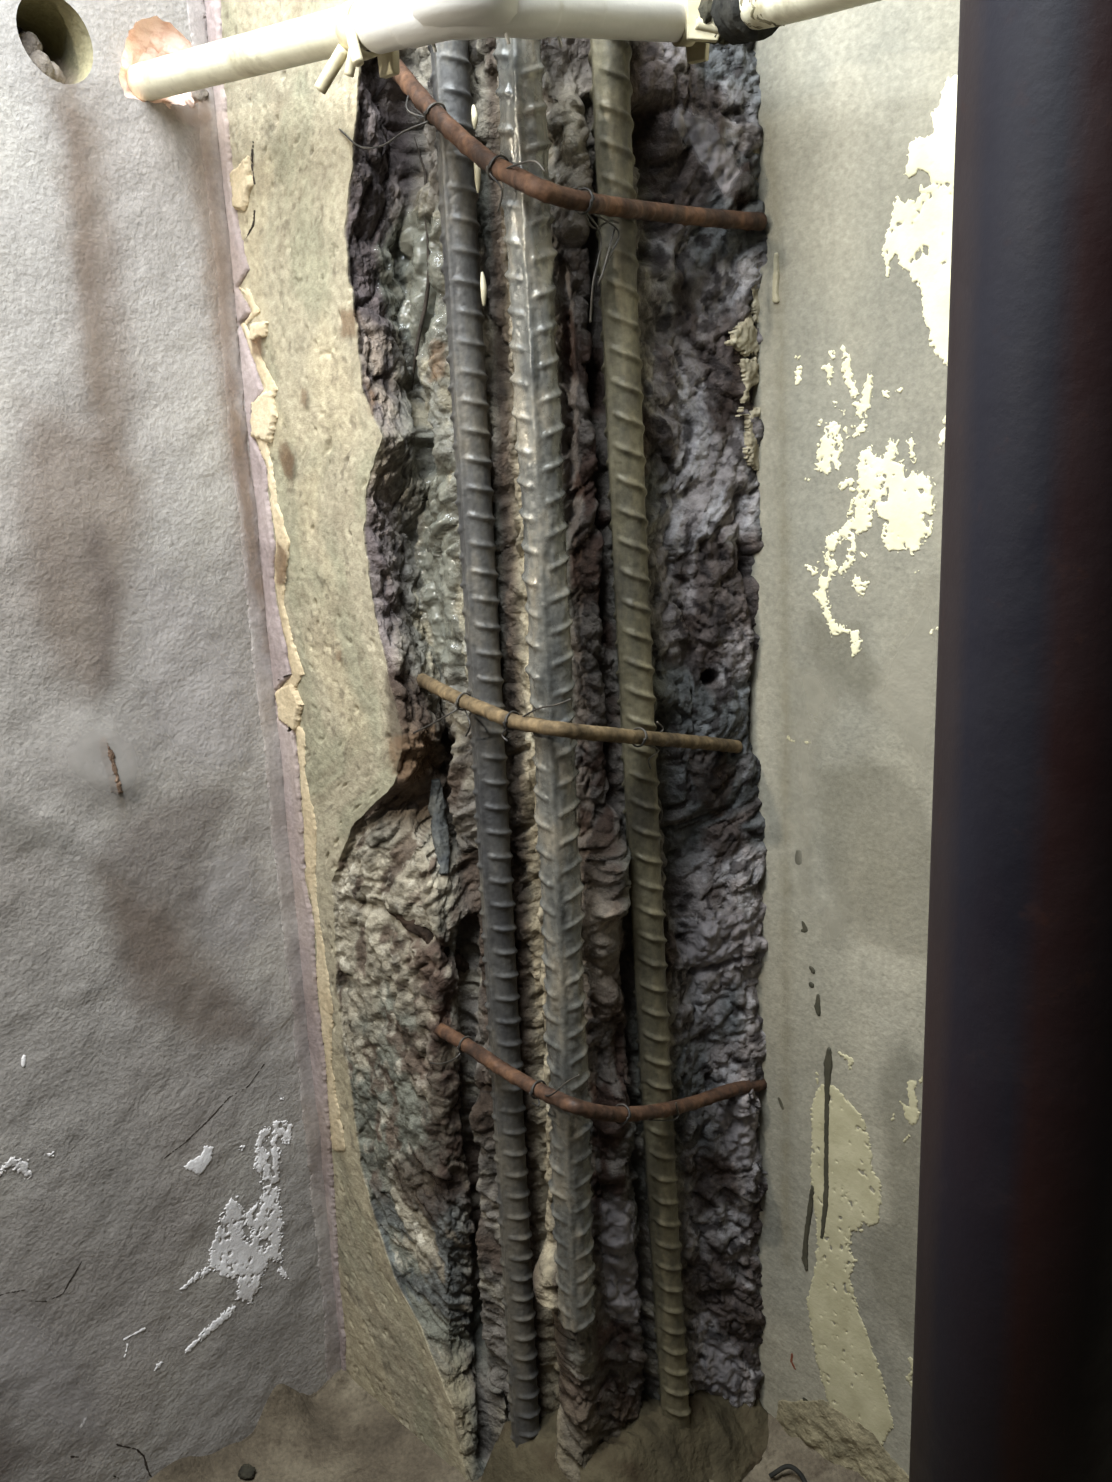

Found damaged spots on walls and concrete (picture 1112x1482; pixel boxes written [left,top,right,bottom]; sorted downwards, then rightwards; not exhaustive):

spalling [541,37,596,193]
peeling [794,355,803,385]
peeling [805,345,937,658]
peeling [881,75,958,366]
peeling [938,415,946,446]
spalling [119,0,510,1481]
spalling [475,169,660,1482]
spalling [629,41,768,1408]
peeling [776,1072,909,1482]